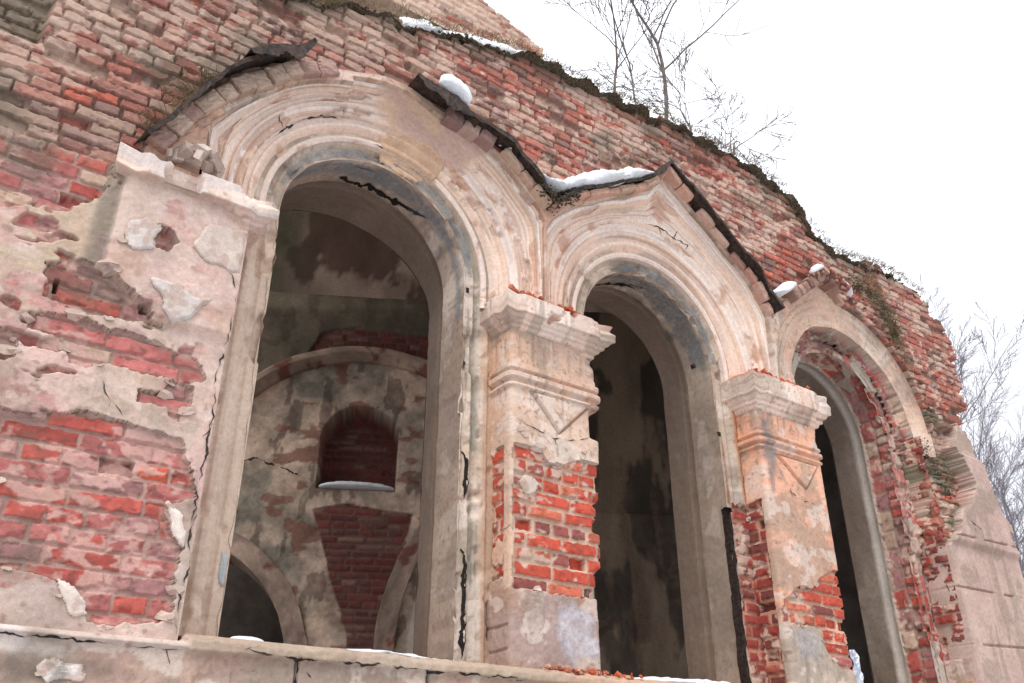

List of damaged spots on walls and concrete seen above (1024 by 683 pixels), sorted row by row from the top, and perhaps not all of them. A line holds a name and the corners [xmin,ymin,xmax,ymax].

spalling [0,257,212,416]
spalling [0,406,197,626]